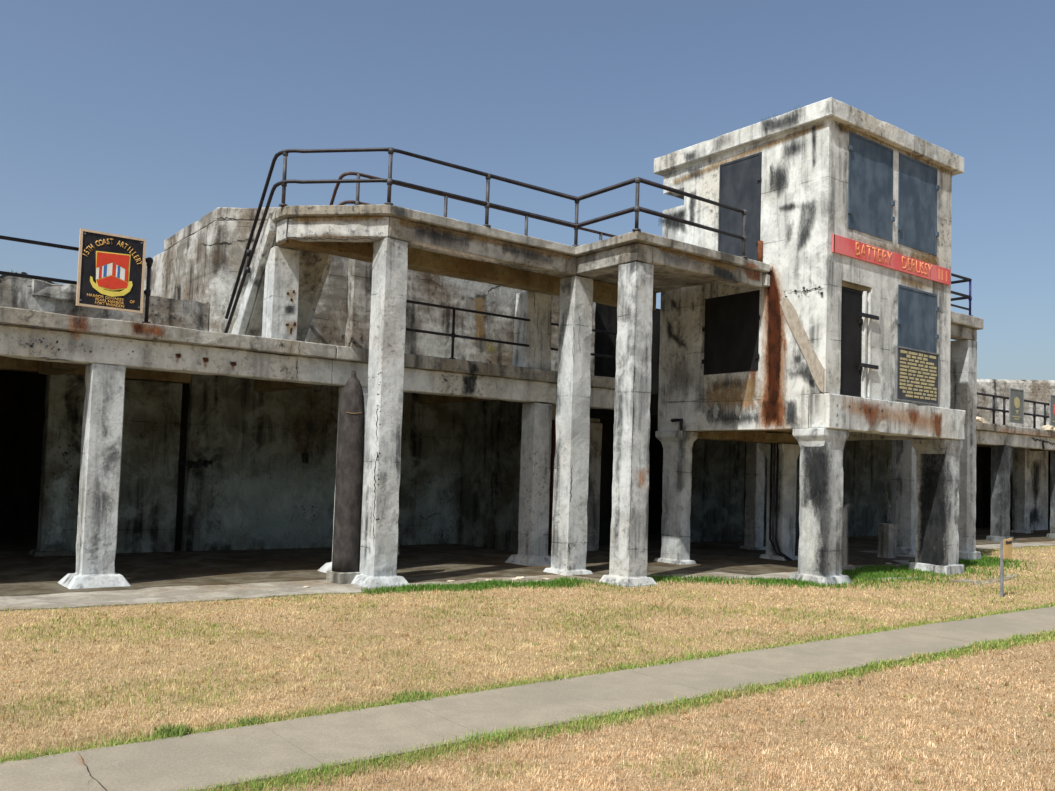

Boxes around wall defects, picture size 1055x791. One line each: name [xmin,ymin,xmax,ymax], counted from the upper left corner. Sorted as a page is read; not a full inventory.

water stain [674,111,953,184]
water stain [396,208,570,260]
water stain [660,192,695,231]
water stain [770,166,816,248]
water stain [660,246,737,283]
rust [132,324,164,335]
rust [743,262,786,425]
rust [836,405,942,435]
water stain [802,442,847,576]